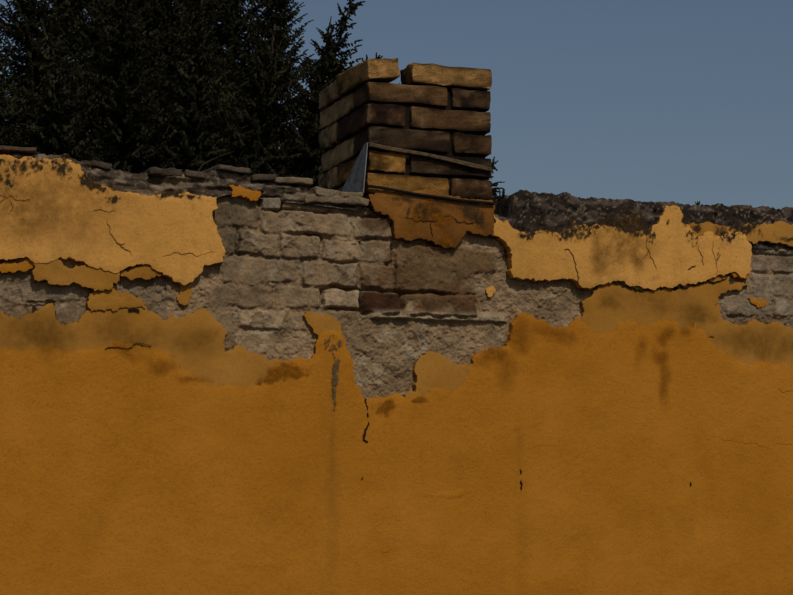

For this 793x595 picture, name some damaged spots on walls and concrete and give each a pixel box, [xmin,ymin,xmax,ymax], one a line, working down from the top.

damp [0,152,118,203]
damp [518,213,656,244]
damp [682,211,701,244]
damp [715,221,761,260]
spalling [0,164,793,411]
crack [362,399,370,442]